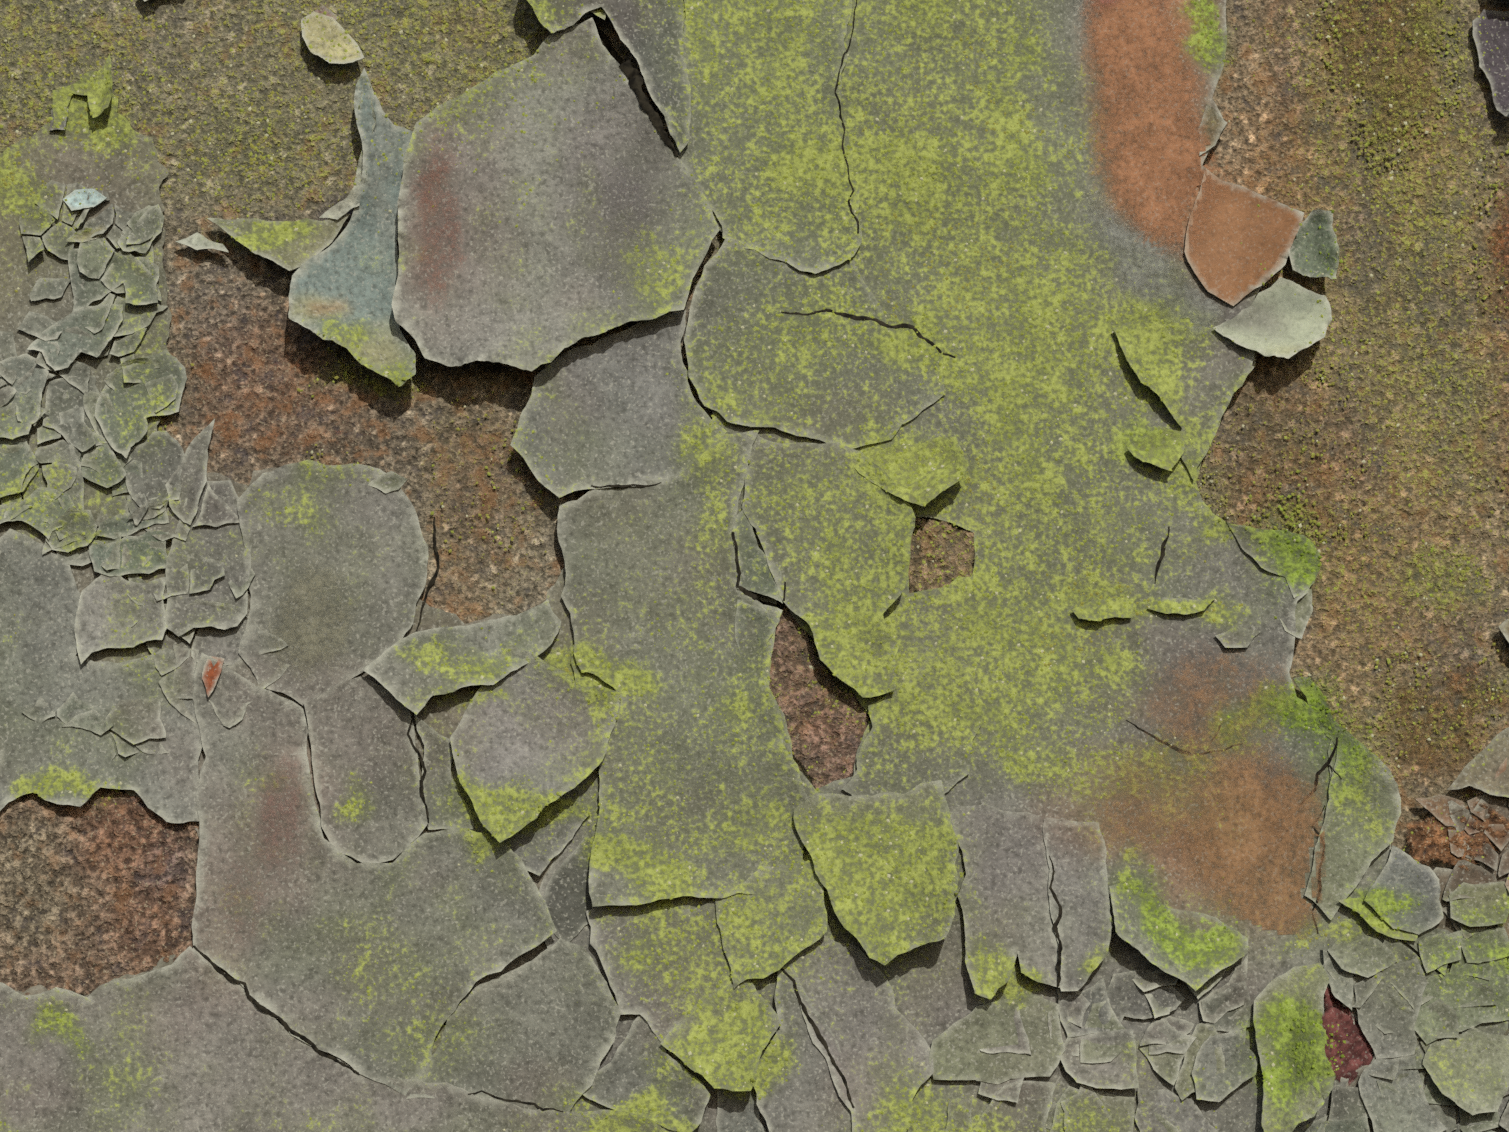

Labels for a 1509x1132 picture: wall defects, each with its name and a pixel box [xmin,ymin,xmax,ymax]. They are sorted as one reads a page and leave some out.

peeling [301,5,365,64]
crack [595,24,678,157]
corrosion [1088,0,1221,250]
crack [781,308,956,358]
leakage [1089,215,1219,334]
peeling [0,54,621,1096]
corrosion [1400,668,1509,767]
corrosion [1142,666,1325,938]
corrosion [1407,803,1509,869]
crack [193,945,359,1074]
peeling [0,900,733,1132]
crack [781,968,855,1108]